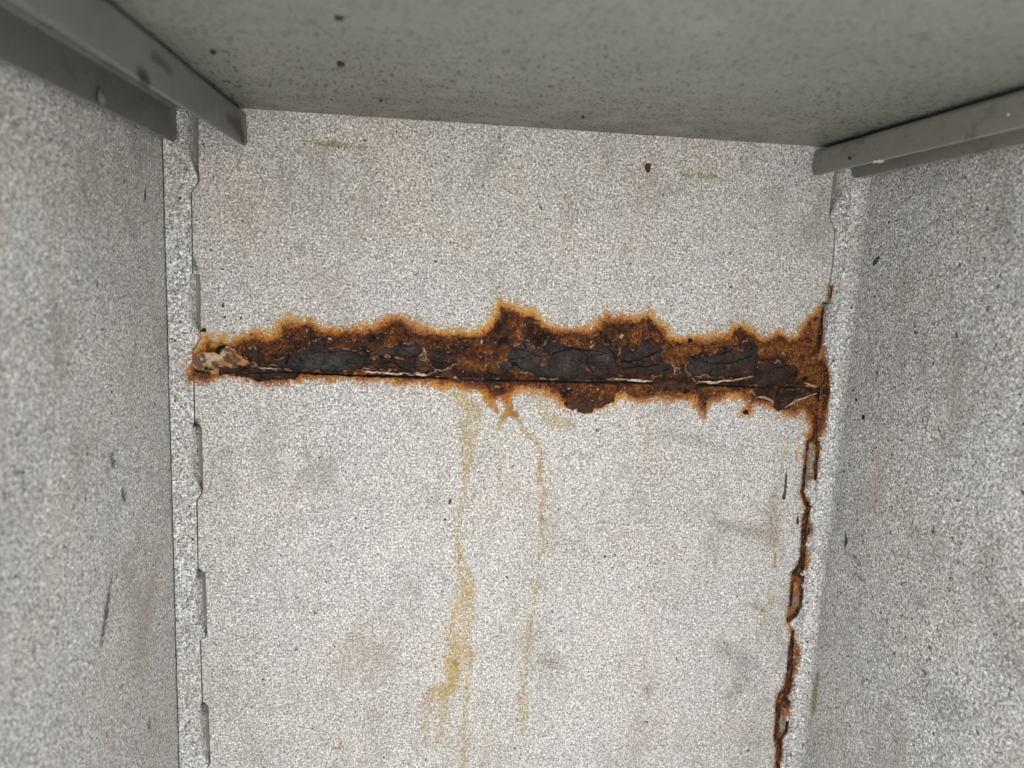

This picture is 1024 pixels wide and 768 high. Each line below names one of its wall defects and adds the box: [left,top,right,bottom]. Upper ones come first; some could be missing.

rust [182,285,835,768]